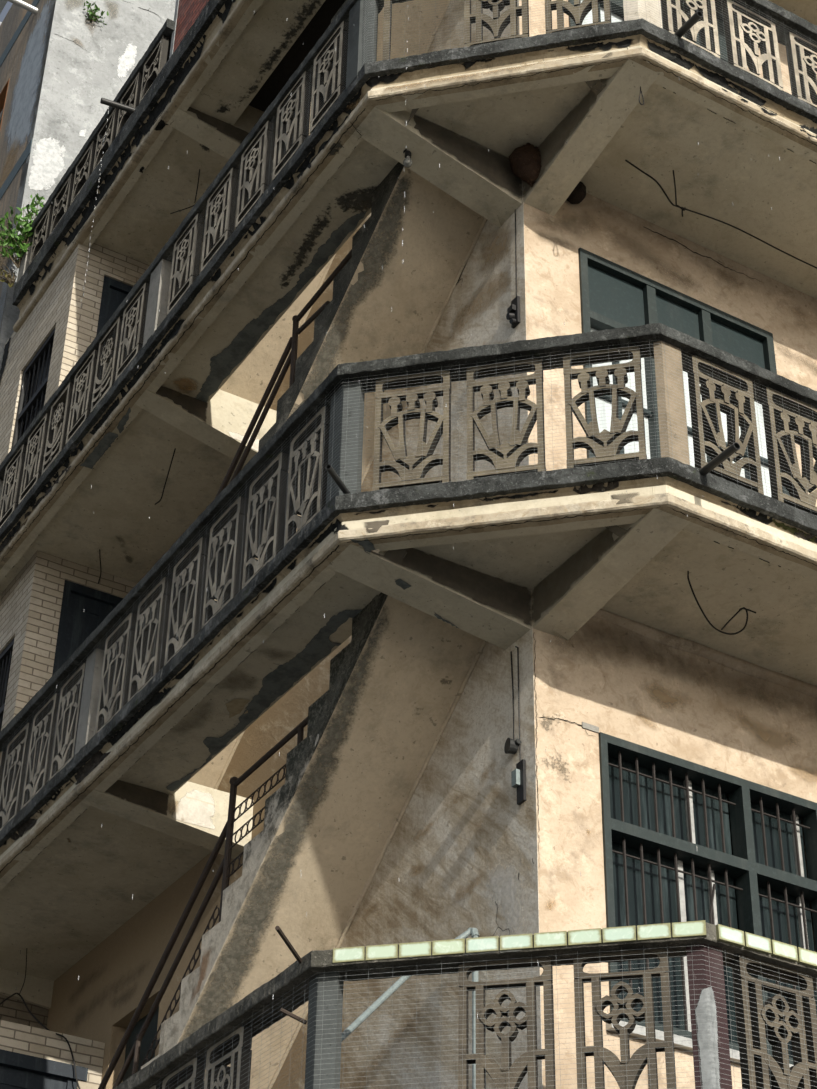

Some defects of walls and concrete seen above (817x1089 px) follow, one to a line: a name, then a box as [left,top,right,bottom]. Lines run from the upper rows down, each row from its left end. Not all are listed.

damp [280,184,380,289]
peeling [166,609,362,830]